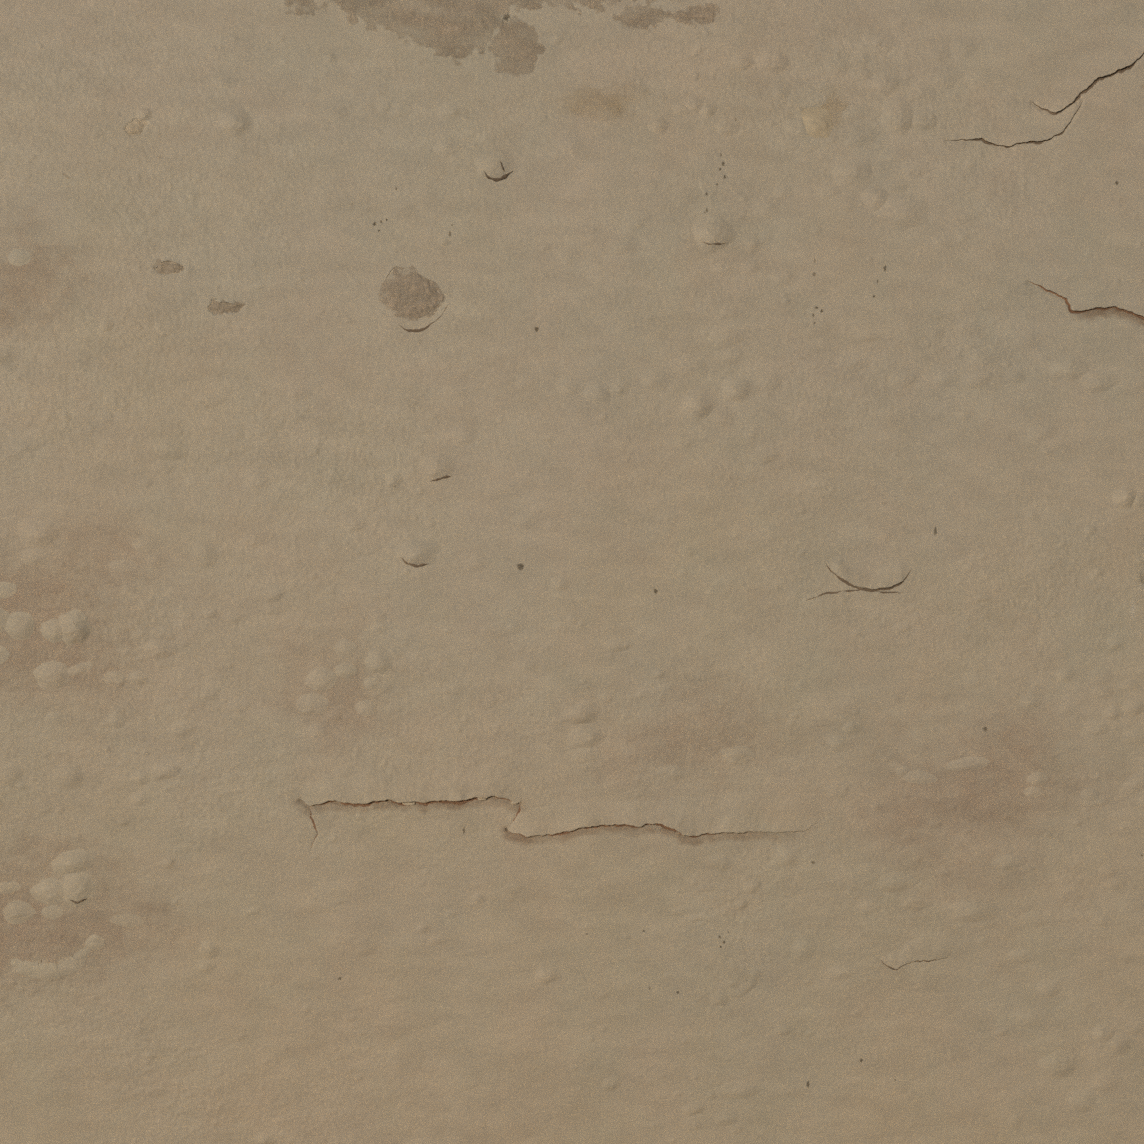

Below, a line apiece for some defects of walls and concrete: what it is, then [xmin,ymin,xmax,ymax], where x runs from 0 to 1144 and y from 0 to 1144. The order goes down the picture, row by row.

crack [1028,270,1144,320]